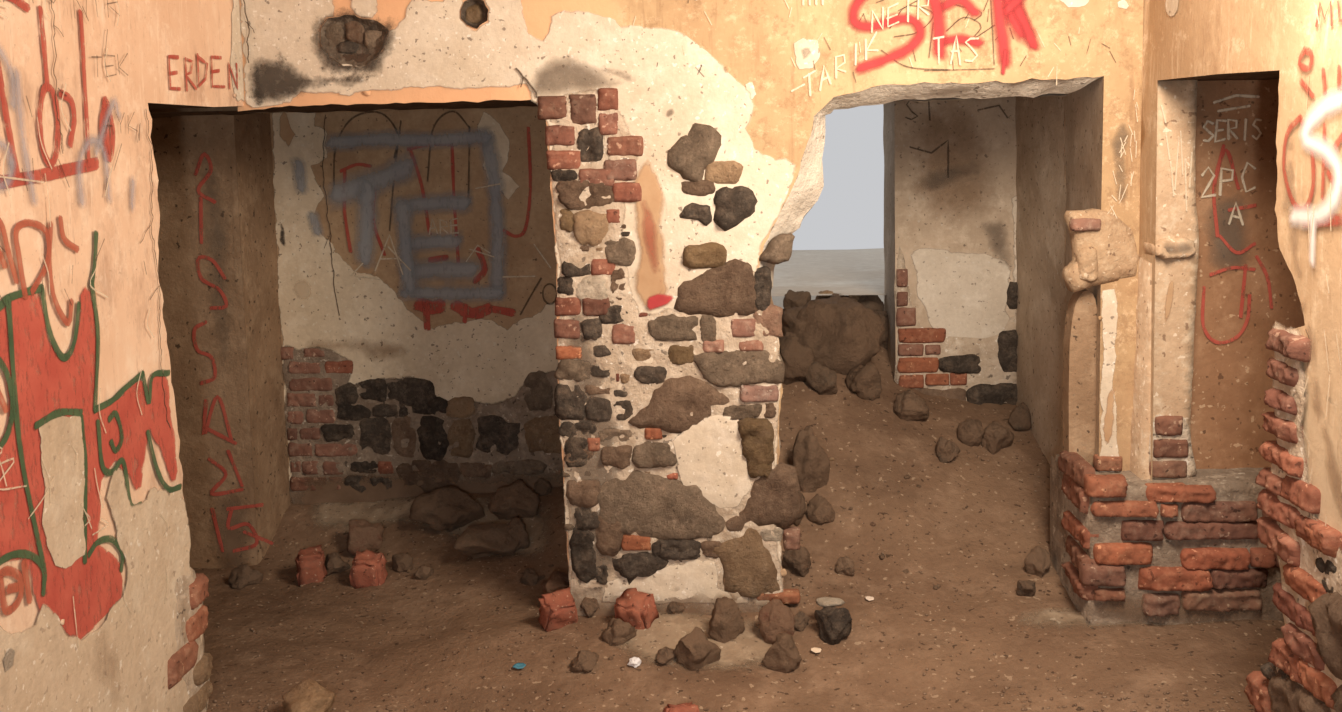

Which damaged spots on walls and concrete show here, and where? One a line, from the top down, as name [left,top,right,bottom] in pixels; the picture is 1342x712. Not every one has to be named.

peeling [0,469,213,712]
flaking render [230,0,801,616]
flaking render [894,246,1018,405]
spalling [1149,414,1197,479]
flaking render [1244,323,1342,712]